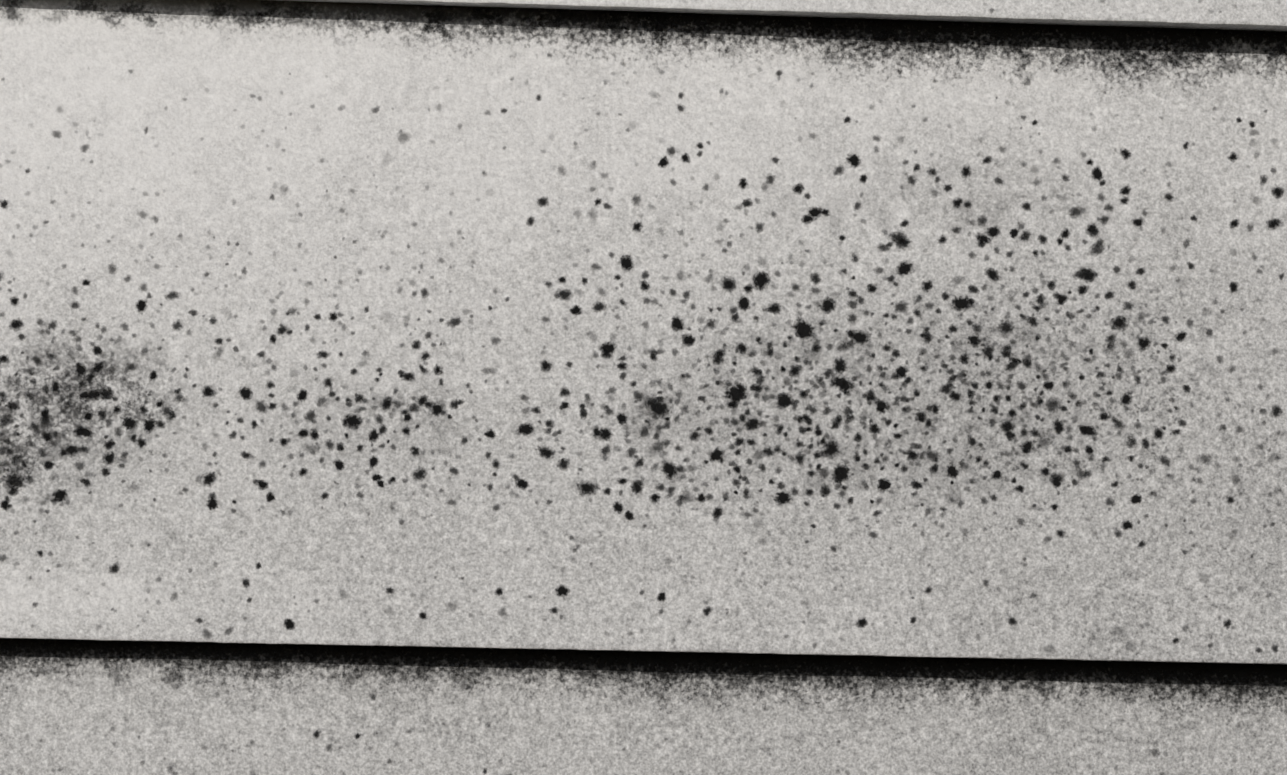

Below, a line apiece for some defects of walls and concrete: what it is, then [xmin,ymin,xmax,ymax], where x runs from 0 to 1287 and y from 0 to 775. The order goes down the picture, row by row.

leakage [658,142,709,167]
leakage [835,154,867,182]
leakage [1261,169,1284,198]
leakage [1231,219,1280,231]
leakage [110,266,178,311]
leakage [174,311,238,351]
leakage [519,159,1192,527]
leakage [0,279,217,513]
leakage [226,309,341,502]
leakage [270,318,472,487]
leakage [462,429,499,490]
leakage [204,472,236,512]